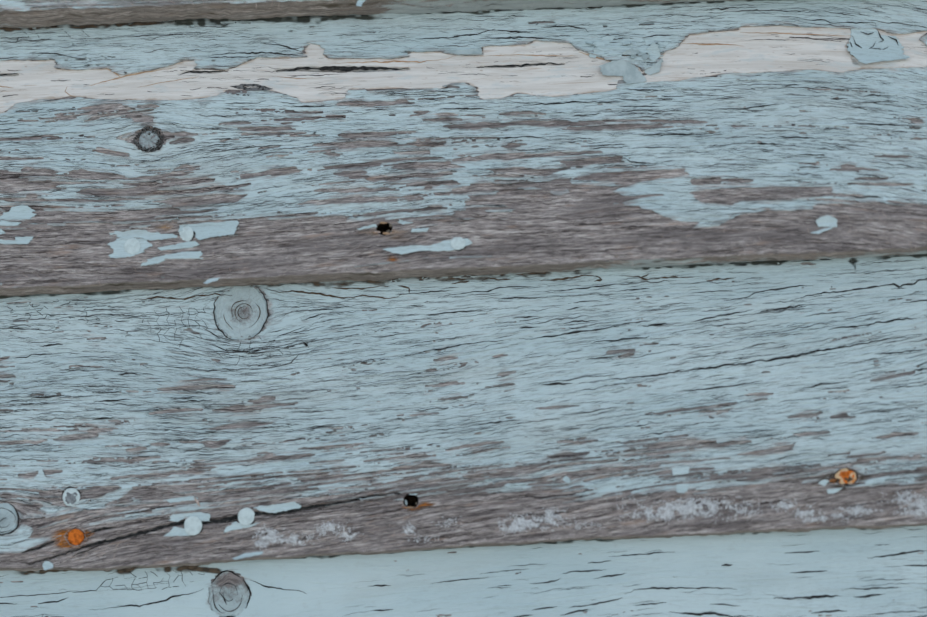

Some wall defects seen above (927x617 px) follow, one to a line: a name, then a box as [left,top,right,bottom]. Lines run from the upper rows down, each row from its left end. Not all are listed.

peeling [0,26,927,113]
peeling [0,167,927,288]
peeling [606,349,635,357]
crack [0,259,927,552]
peeling [0,462,927,570]
peeling [733,442,796,455]
rust [820,472,868,488]
crack [344,527,927,617]